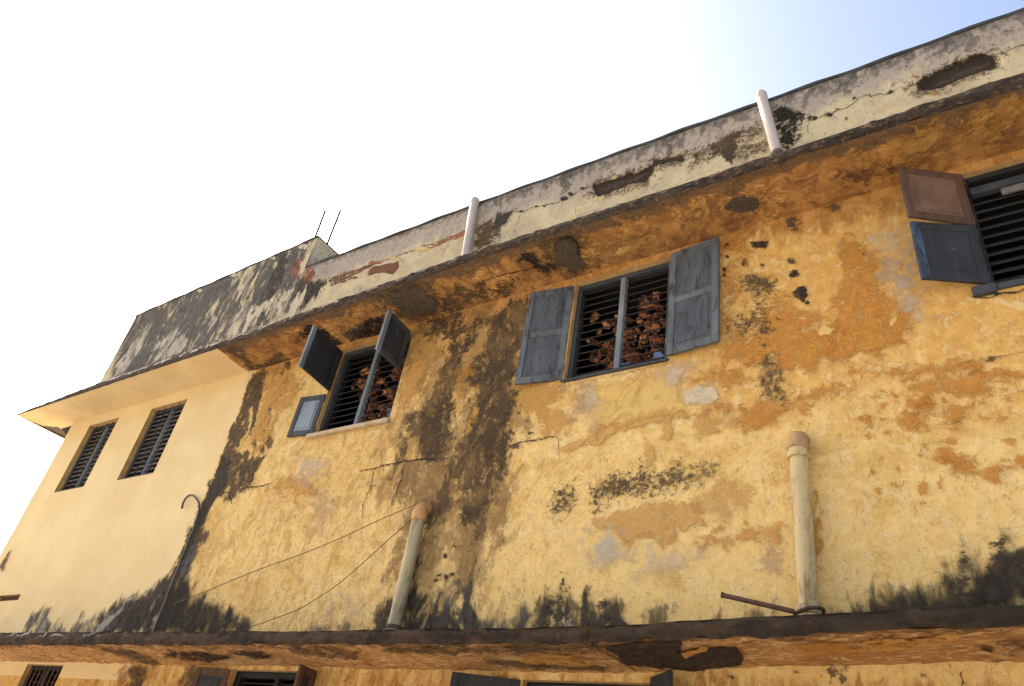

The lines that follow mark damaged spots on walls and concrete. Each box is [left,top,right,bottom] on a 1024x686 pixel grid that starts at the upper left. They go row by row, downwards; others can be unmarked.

spalling [902,44,1009,98]
crack [801,65,909,133]
water stain [781,130,795,150]
spalling [582,151,698,204]
spalling [724,196,760,212]
water stain [104,240,327,378]
crack [508,431,559,460]
water stain [373,226,1024,630]
water stain [24,352,324,633]
crack [362,455,459,515]
spalling [94,642,744,672]